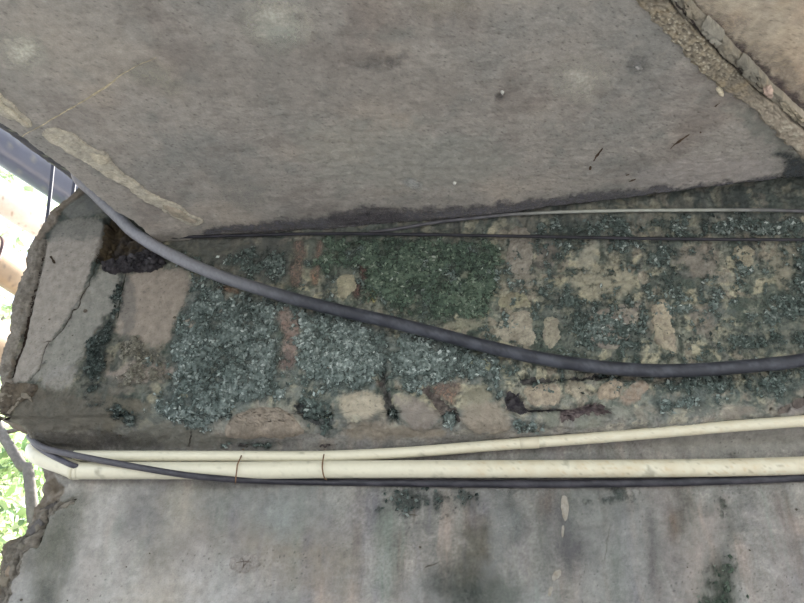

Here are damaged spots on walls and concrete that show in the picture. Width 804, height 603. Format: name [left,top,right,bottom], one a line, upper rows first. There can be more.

spalling [672,0,725,46]
spalling [736,53,804,124]
crack [12,238,98,380]
spalling [0,382,38,421]
spalling [0,499,76,603]